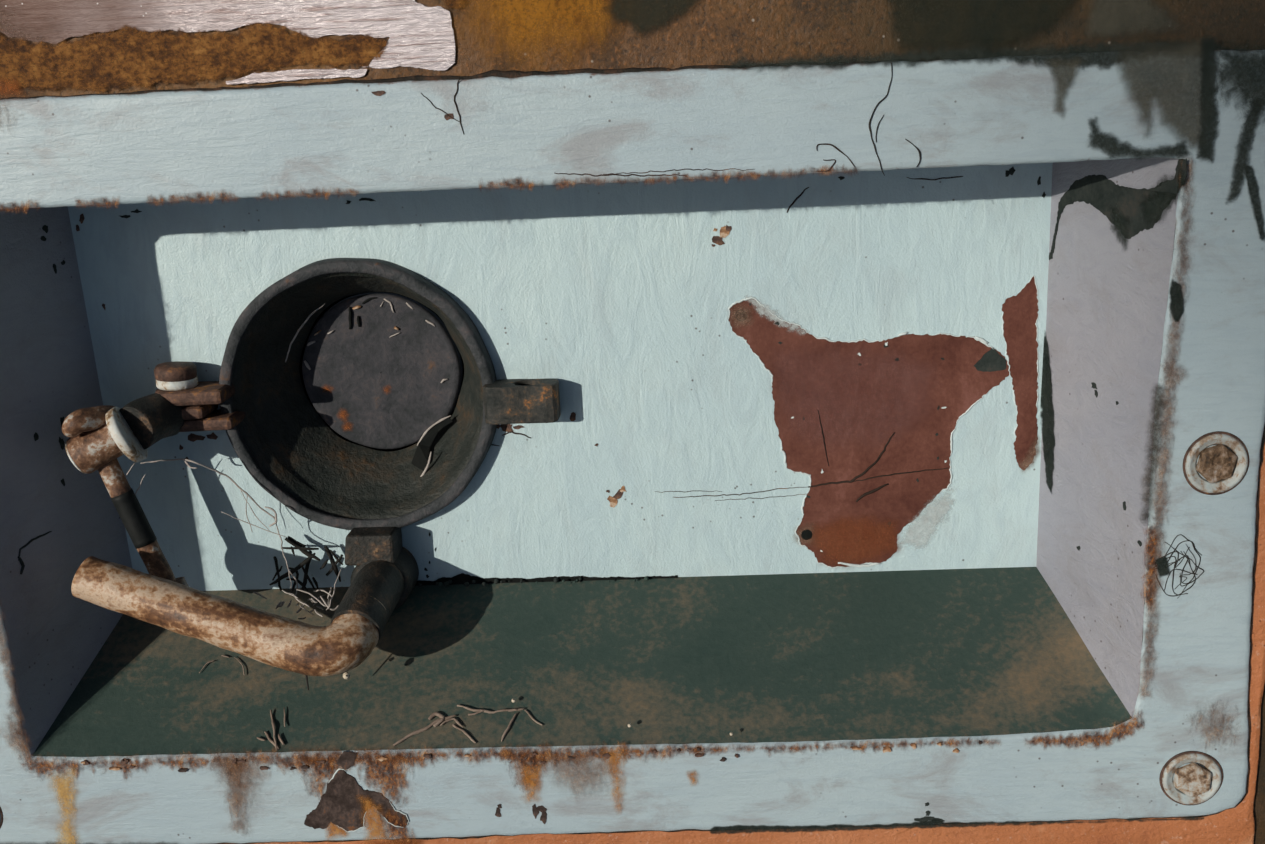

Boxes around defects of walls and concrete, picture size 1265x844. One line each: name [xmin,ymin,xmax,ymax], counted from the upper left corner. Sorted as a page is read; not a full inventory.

corrosion [0,23,388,94]
peeling [0,0,455,85]
peeling [728,275,1039,568]
corrosion [1140,164,1192,674]
corrosion [606,486,627,508]
corrosion [0,636,994,844]
corrosion [1029,716,1144,748]